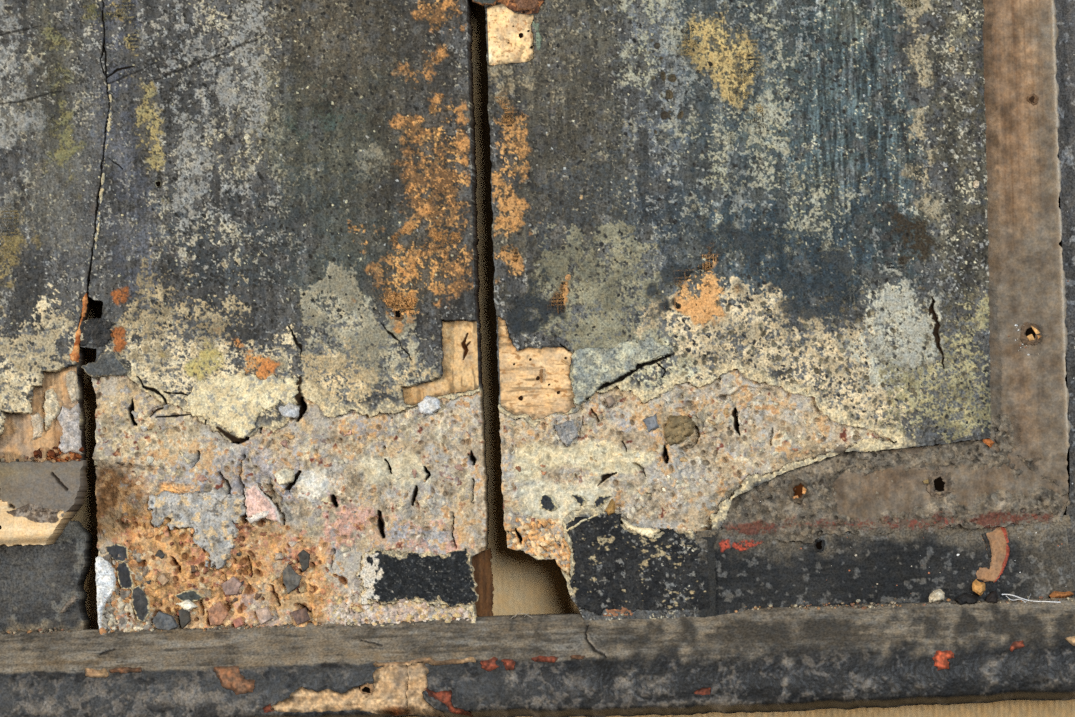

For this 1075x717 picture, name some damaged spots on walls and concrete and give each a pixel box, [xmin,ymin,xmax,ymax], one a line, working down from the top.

rust [417,47,448,82]
rust [412,0,459,32]
peeling [472,0,544,65]
crack [88,0,134,280]
rust [492,94,530,237]
rust [366,93,473,333]
rust [494,251,524,276]
rust [674,254,724,326]
crack [586,354,671,400]
spalling [0,318,487,635]